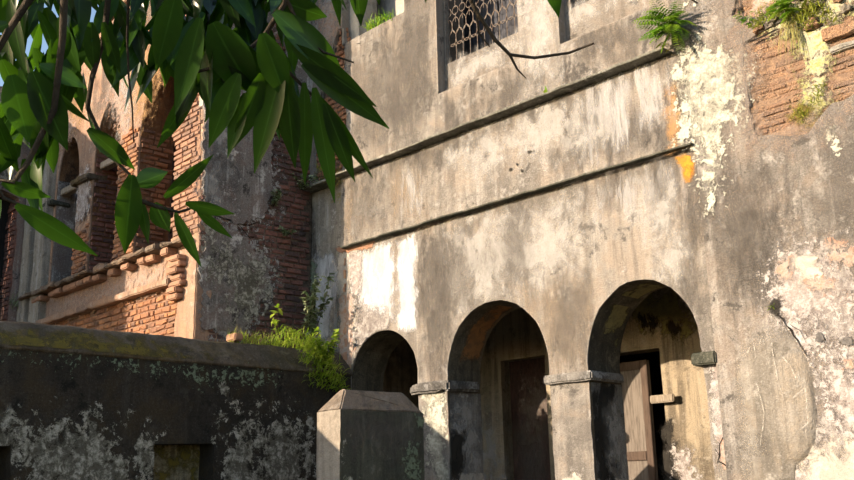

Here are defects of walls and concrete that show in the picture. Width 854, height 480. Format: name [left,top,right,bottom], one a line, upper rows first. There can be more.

flaking render [311,0,351,70]
flaking render [324,93,346,125]
leakage [403,100,501,204]
leakage [456,0,552,123]
leakage [569,4,595,23]
leakage [507,19,678,229]
spalling [710,0,854,136]
leakage [418,205,568,380]
crack [778,315,807,356]
peeling [754,226,854,480]